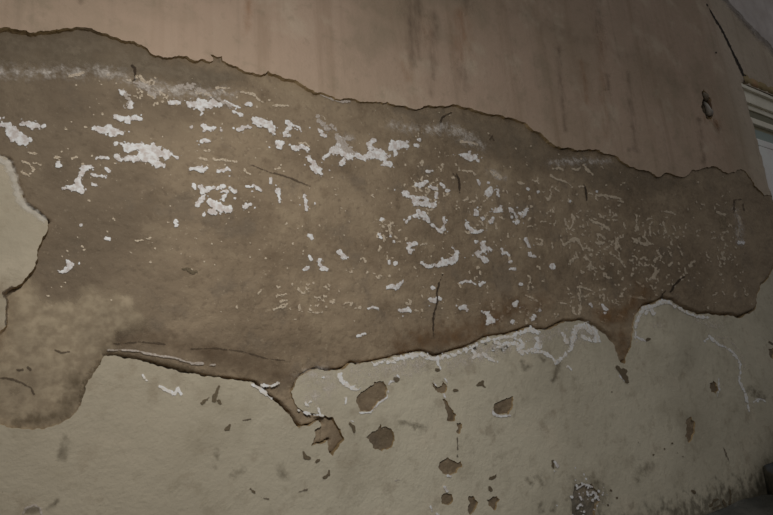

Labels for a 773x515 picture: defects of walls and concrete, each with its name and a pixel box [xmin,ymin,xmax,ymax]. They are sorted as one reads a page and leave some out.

spalling [51,39,107,70]
spalling [122,53,166,73]
spalling [169,66,216,86]
crack [707,4,746,76]
crack [432,274,443,335]
damp [371,321,601,371]
damp [634,299,766,412]
damp [251,382,280,400]
damp [309,371,360,405]
spalling [356,374,400,414]
spalling [432,368,462,434]
spalling [367,424,395,451]